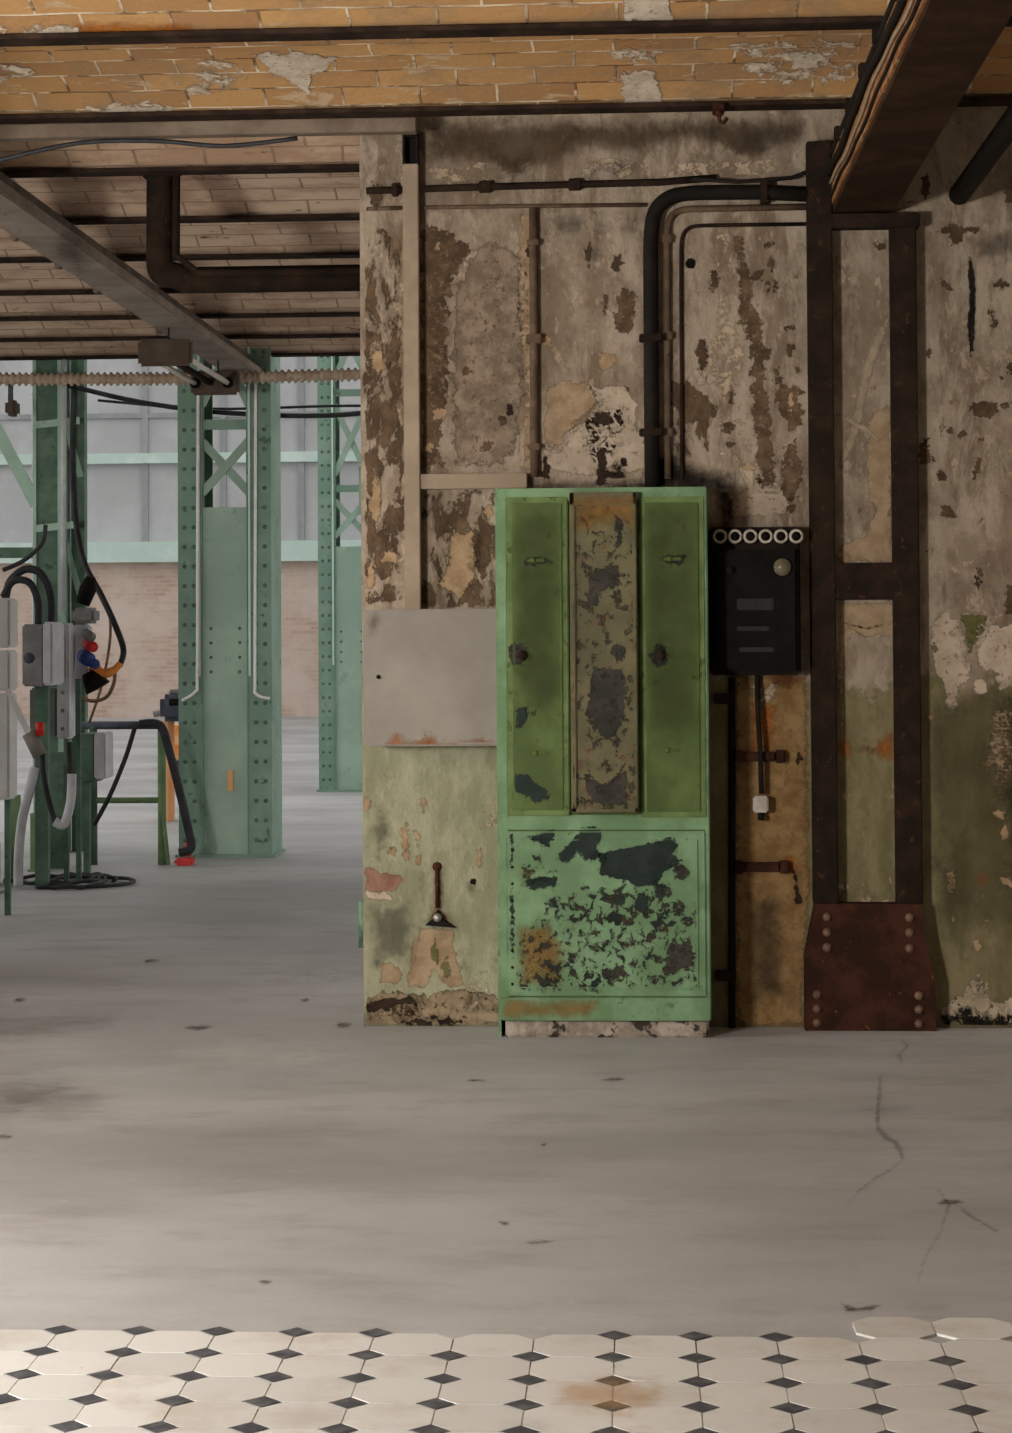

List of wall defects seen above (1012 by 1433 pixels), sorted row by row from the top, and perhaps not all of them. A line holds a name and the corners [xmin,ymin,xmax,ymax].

peeling [0,60,35,83]
peeling [85,100,173,113]
peeling [173,51,338,95]
peeling [729,36,859,85]
peeling [420,213,644,476]
peeling [362,229,405,604]
peeling [421,489,496,608]
peeling [927,584,1012,720]
peeling [983,708,1012,784]
flaking render [364,822,421,901]
peeling [991,810,1009,840]